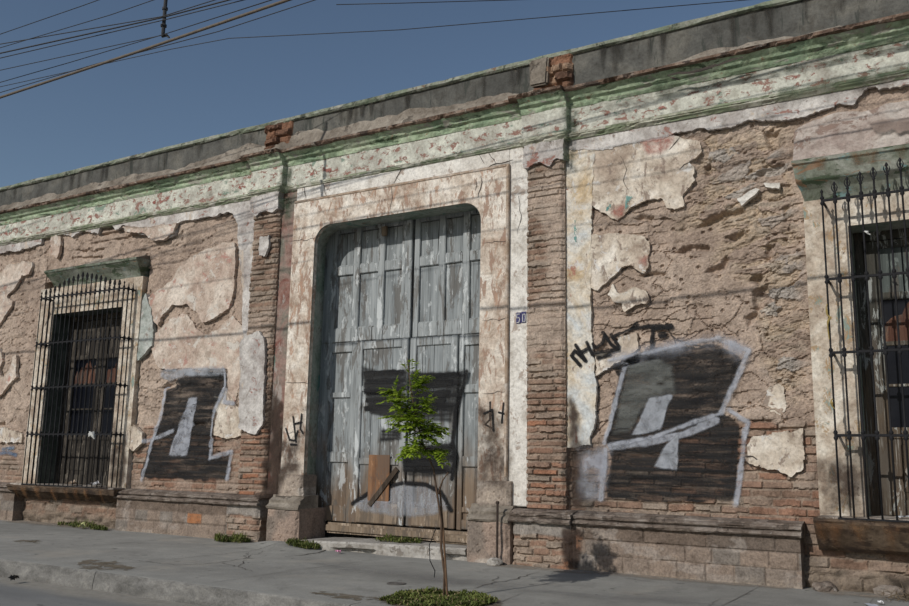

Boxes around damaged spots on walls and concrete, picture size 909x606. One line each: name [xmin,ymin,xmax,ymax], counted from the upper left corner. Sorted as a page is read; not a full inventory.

flaking render [0,200,271,494]
spalling [566,78,909,524]